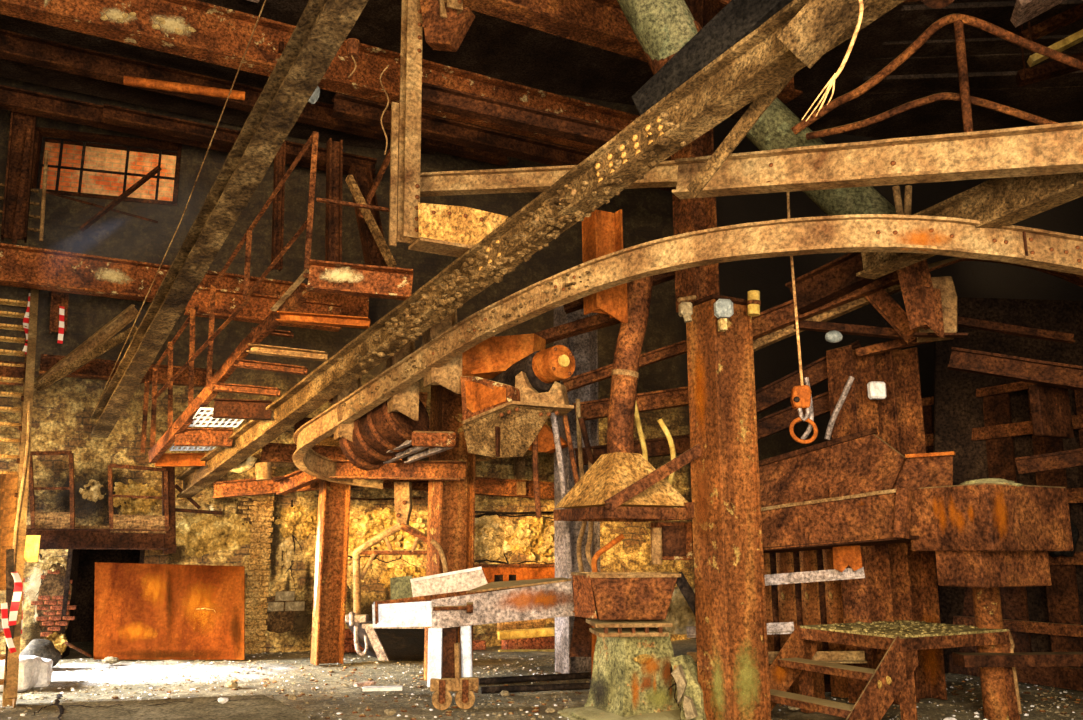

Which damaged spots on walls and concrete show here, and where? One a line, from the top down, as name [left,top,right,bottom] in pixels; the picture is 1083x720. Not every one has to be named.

rust [323,270,360,281]
rust [996,498,1005,526]